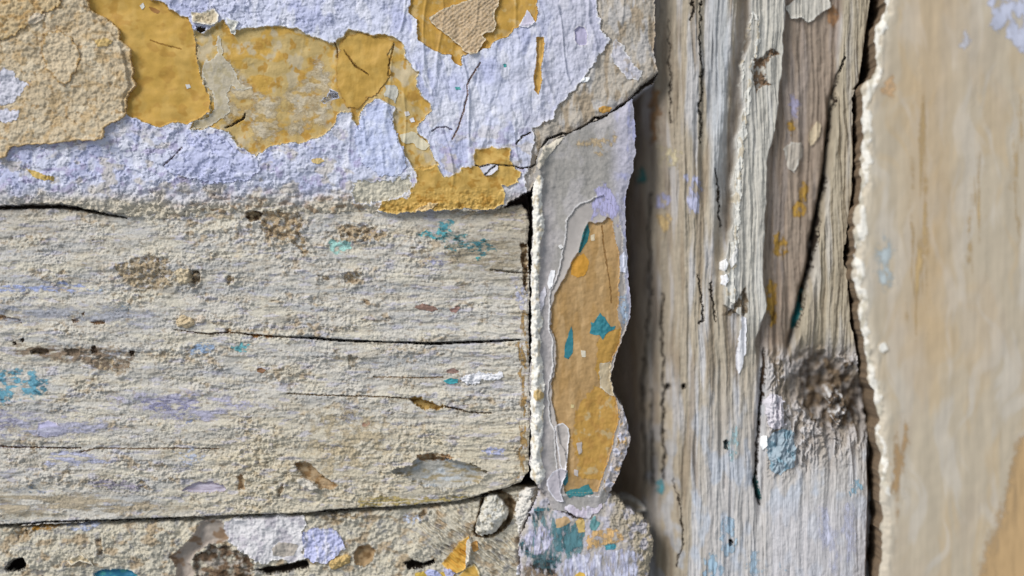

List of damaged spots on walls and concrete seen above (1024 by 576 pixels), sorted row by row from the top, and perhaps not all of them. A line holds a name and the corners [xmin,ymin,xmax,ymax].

crack [0,204,127,219]
peeling [0,0,658,215]
crack [475,0,704,175]
crack [794,58,846,328]
crack [175,330,520,345]
peeling [525,196,646,576]
crack [0,488,505,526]
peeling [169,513,376,576]